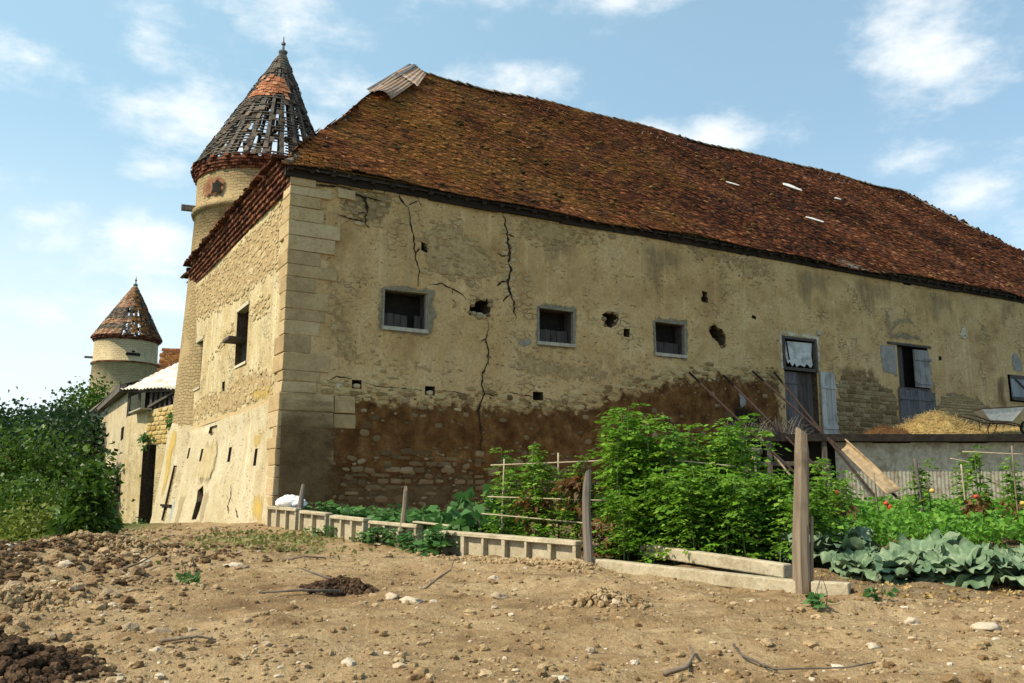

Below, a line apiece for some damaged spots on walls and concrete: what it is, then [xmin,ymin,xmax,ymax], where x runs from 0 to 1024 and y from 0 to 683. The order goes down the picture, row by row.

crack [316,184,466,299]
flaking render [416,220,504,320]
crack [476,213,519,451]
flaking render [320,277,785,523]